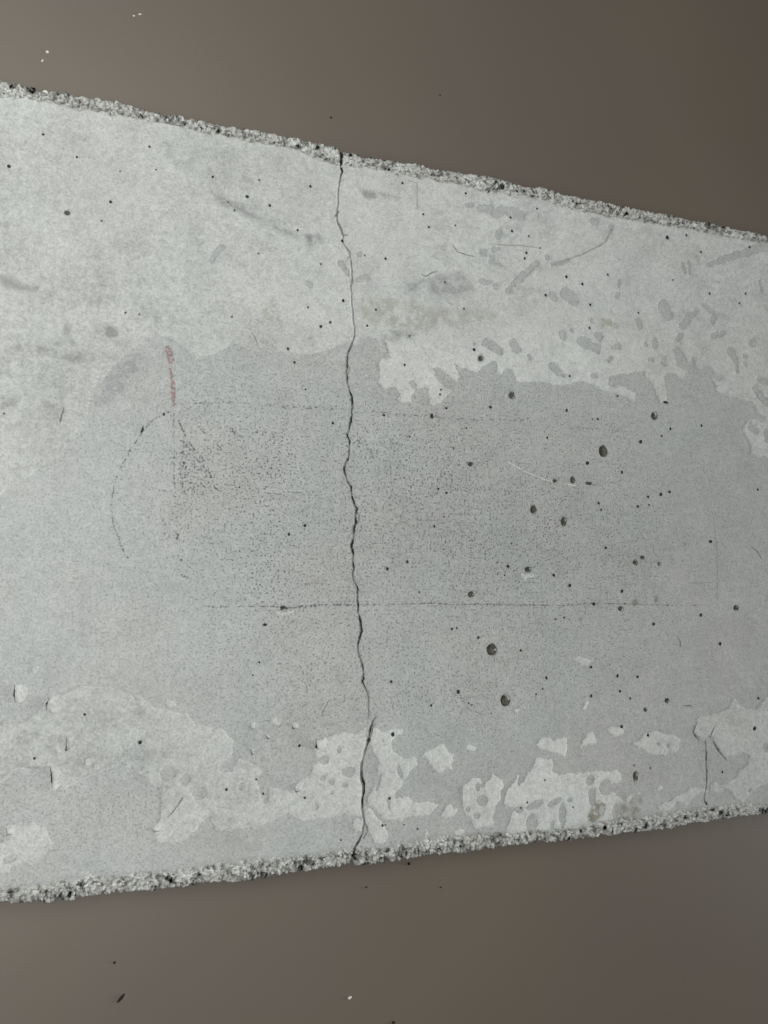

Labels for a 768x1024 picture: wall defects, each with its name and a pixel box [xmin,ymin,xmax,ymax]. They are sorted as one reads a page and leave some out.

crack [336,152,375,860]